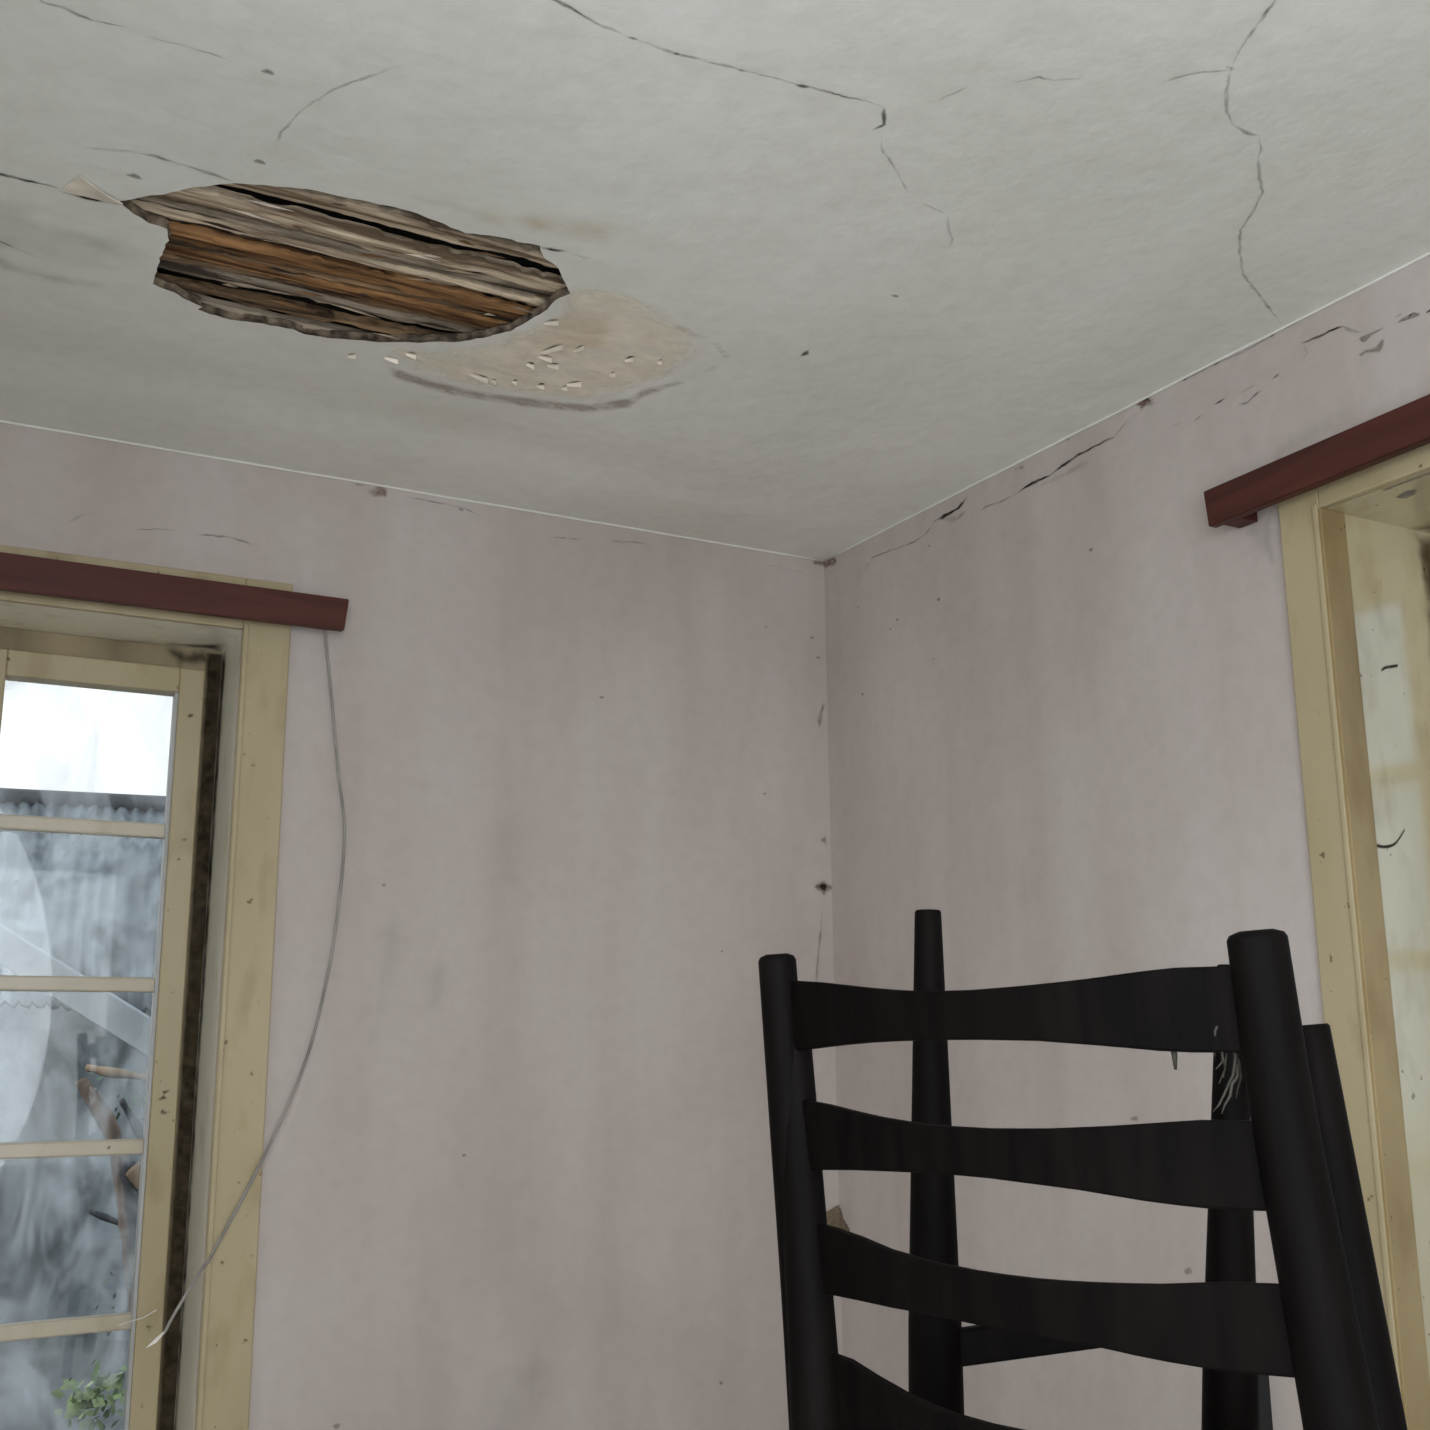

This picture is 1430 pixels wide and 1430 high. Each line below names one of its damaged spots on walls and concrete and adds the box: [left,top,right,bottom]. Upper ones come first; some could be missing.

crack [554,0,586,18]
crack [800,85,885,127]
crack [76,195,124,204]
flaking render [120,200,172,239]
flaking render [153,267,571,365]
flaking render [526,345,584,391]
crack [1022,441,1104,490]
crack [879,502,963,555]
flaking render [826,1206,850,1231]